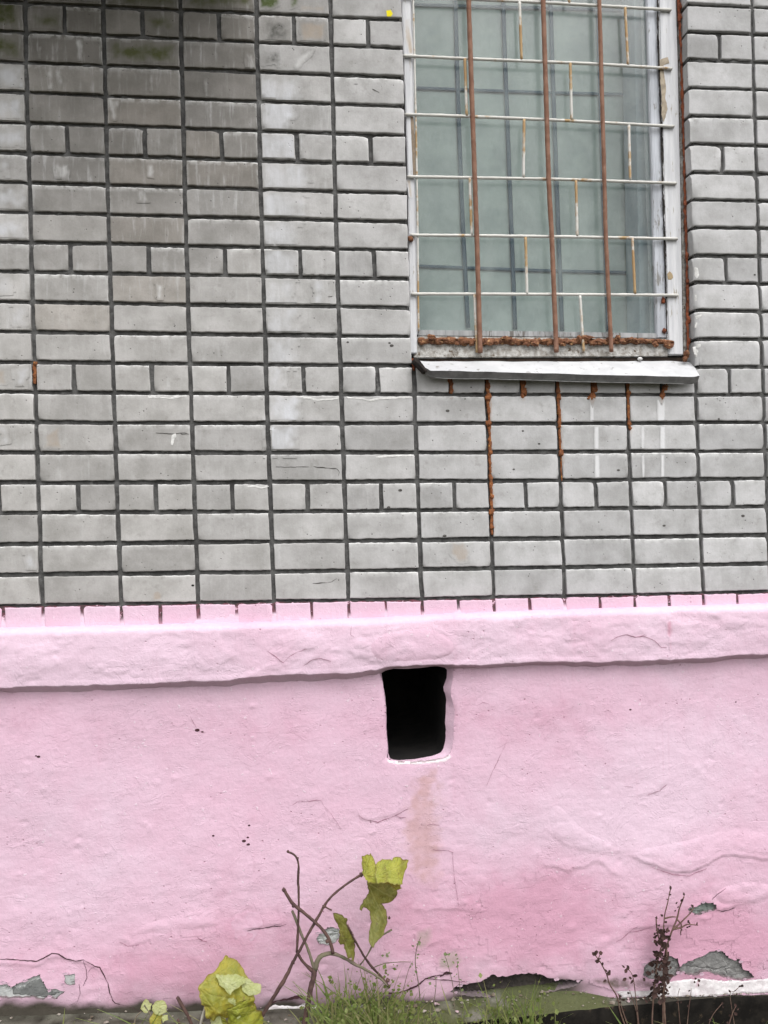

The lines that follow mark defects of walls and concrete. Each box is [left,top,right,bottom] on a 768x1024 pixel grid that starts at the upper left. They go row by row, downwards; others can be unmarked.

rust [485,380,496,536]
rust [556,381,566,485]
rust [587,382,598,408]
rust [626,383,634,437]
flaking render [688,901,717,915]
flaking render [0,972,75,1001]
crack [0,953,140,1012]
peeling [616,949,768,998]